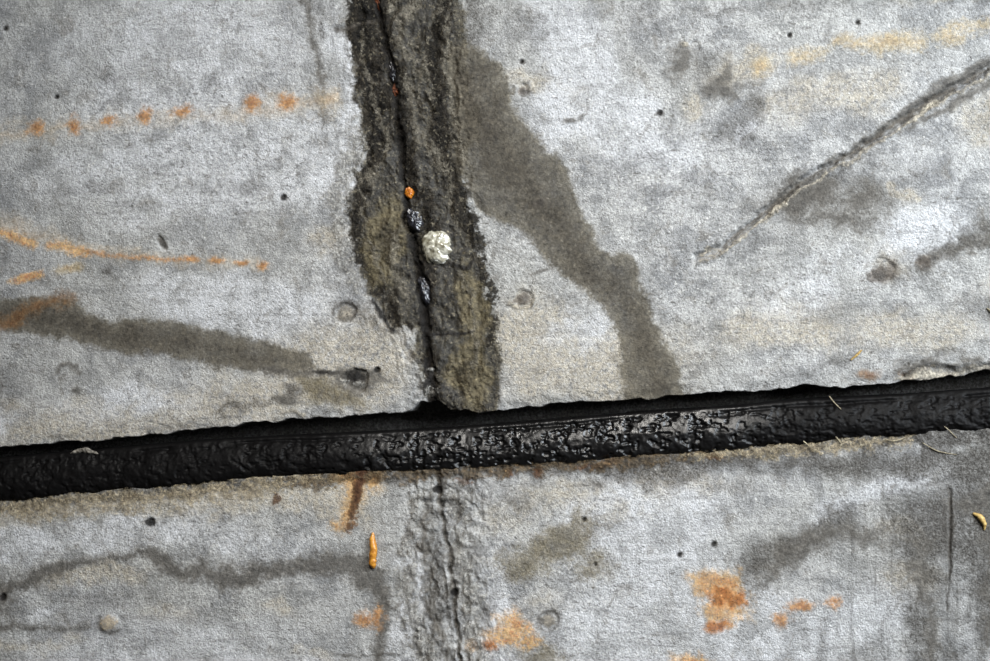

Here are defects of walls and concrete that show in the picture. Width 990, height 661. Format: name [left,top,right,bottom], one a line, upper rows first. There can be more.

rust [245,96,261,110]
crack [699,58,990,262]
crack [335,0,475,402]
leakage [321,0,685,413]
leakage [0,296,324,377]
crack [315,367,358,375]
leakage [273,394,306,421]
rust [335,471,375,533]
rust [470,613,533,649]
rust [693,572,748,633]